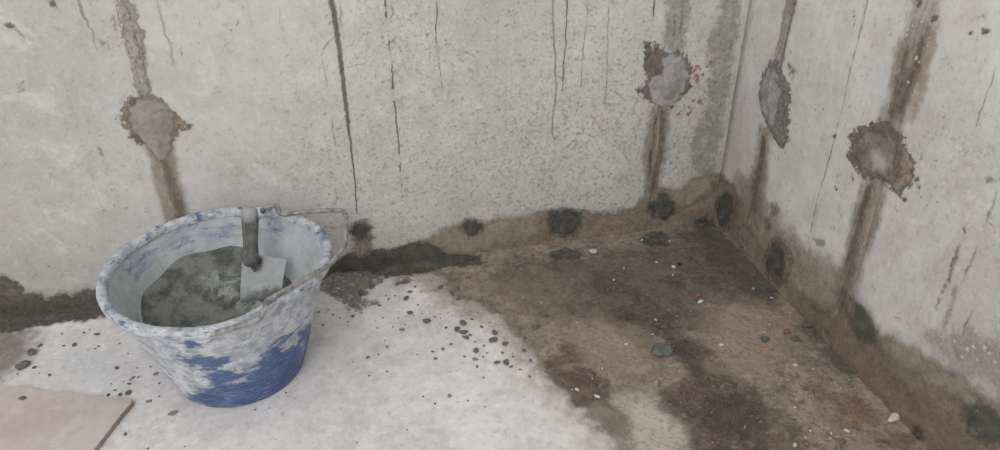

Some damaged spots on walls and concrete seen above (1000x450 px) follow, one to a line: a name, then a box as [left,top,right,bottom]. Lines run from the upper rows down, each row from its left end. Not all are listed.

spalling [115,94,193,162]
leakage [149,151,186,220]
crack [329,0,357,211]
crack [384,0,403,199]
crack [561,0,569,88]
spalling [637,41,692,110]
spalling [758,59,795,149]
spalling [846,118,920,202]
leakage [881,2,935,130]
leakage [0,276,105,333]
leakage [326,107,1000,450]